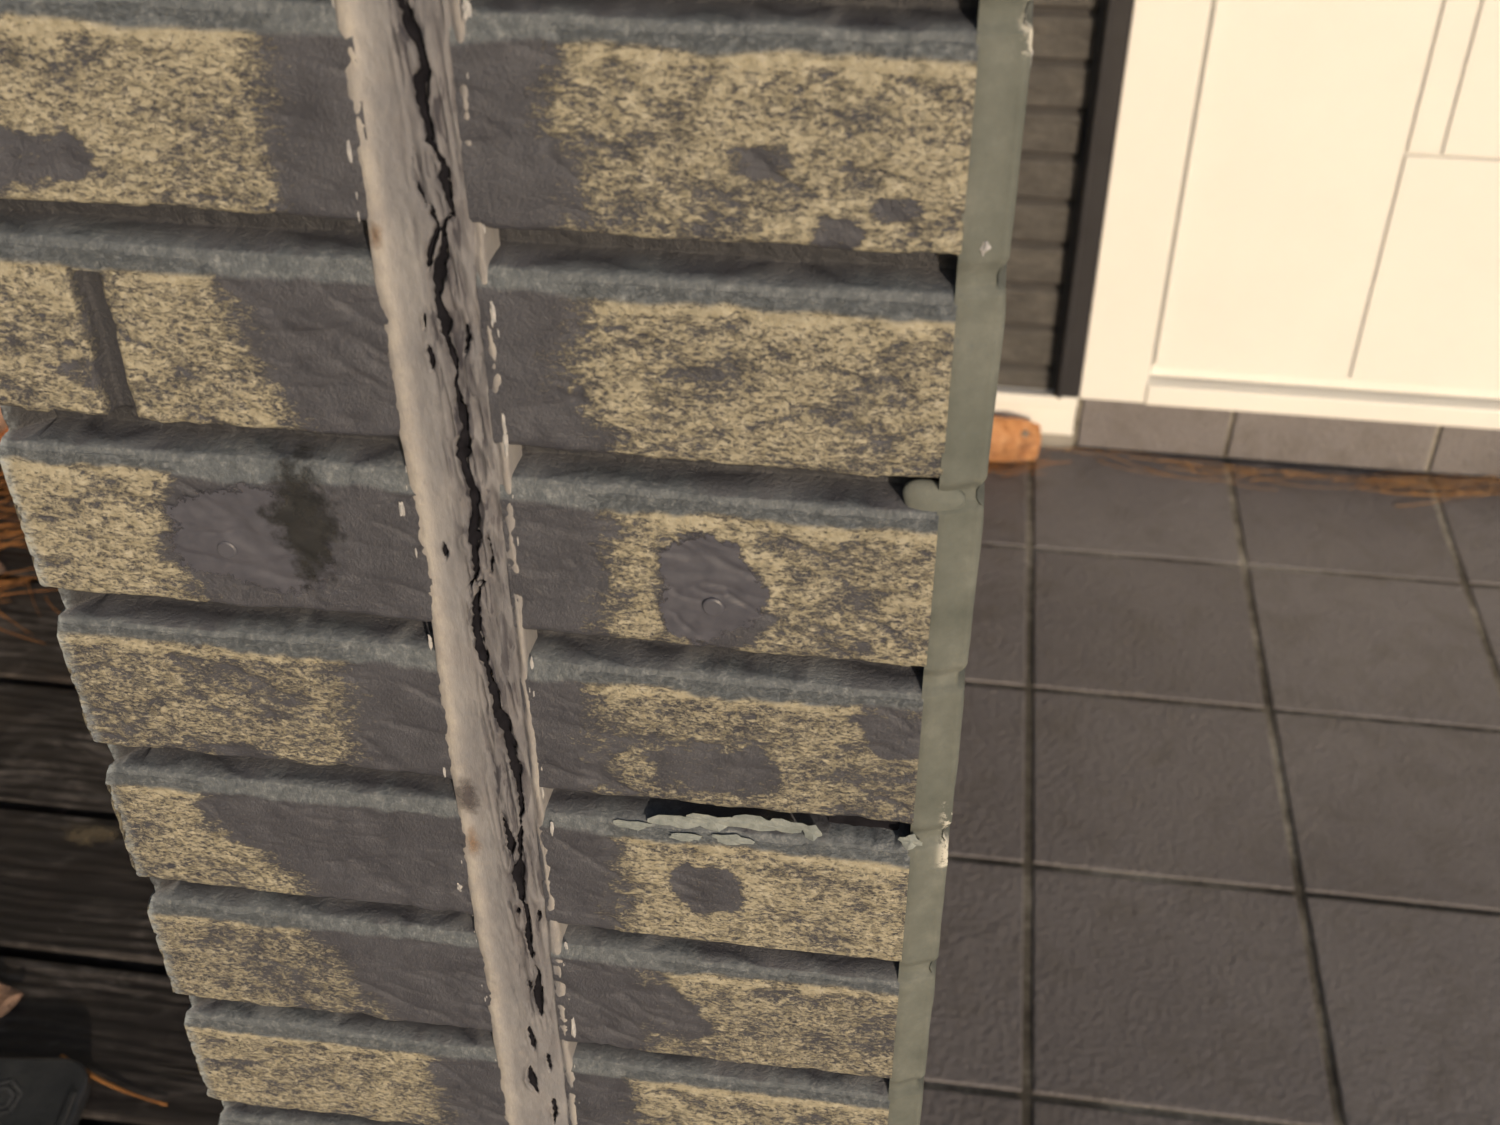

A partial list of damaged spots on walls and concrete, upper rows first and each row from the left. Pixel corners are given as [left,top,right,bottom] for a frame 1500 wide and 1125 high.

water stain [259,447,338,580]
crack [398,0,558,1121]